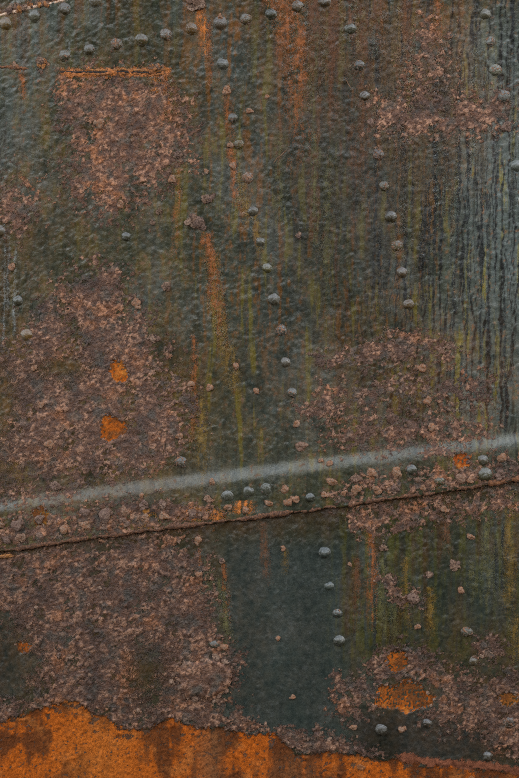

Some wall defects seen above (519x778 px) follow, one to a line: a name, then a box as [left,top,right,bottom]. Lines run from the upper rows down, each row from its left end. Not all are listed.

rust [0,0,242,405]
rust [264,0,519,303]
peeling [100,413,128,442]
peeling [109,356,131,385]
rust [0,250,519,765]
peeling [374,650,436,714]